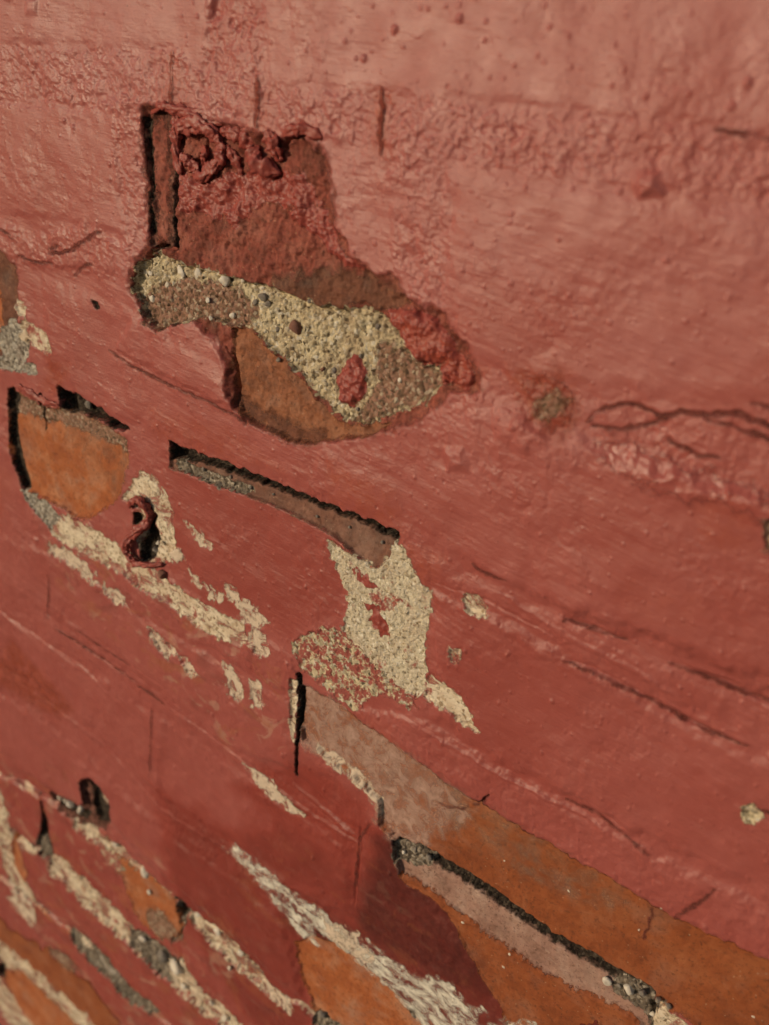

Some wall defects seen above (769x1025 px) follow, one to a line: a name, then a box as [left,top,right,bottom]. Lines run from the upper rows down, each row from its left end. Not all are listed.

spalling [128,100,480,444]
spalling [0,251,270,658]
crack [169,440,400,568]
peeling [522,376,573,434]
crack [586,401,769,458]
peeling [147,626,198,679]
peeling [221,661,262,709]
crack [288,672,307,776]
peeling [291,537,769,1025]
peeling [0,793,119,1025]
peeling [101,844,184,941]
crack [391,837,672,1025]